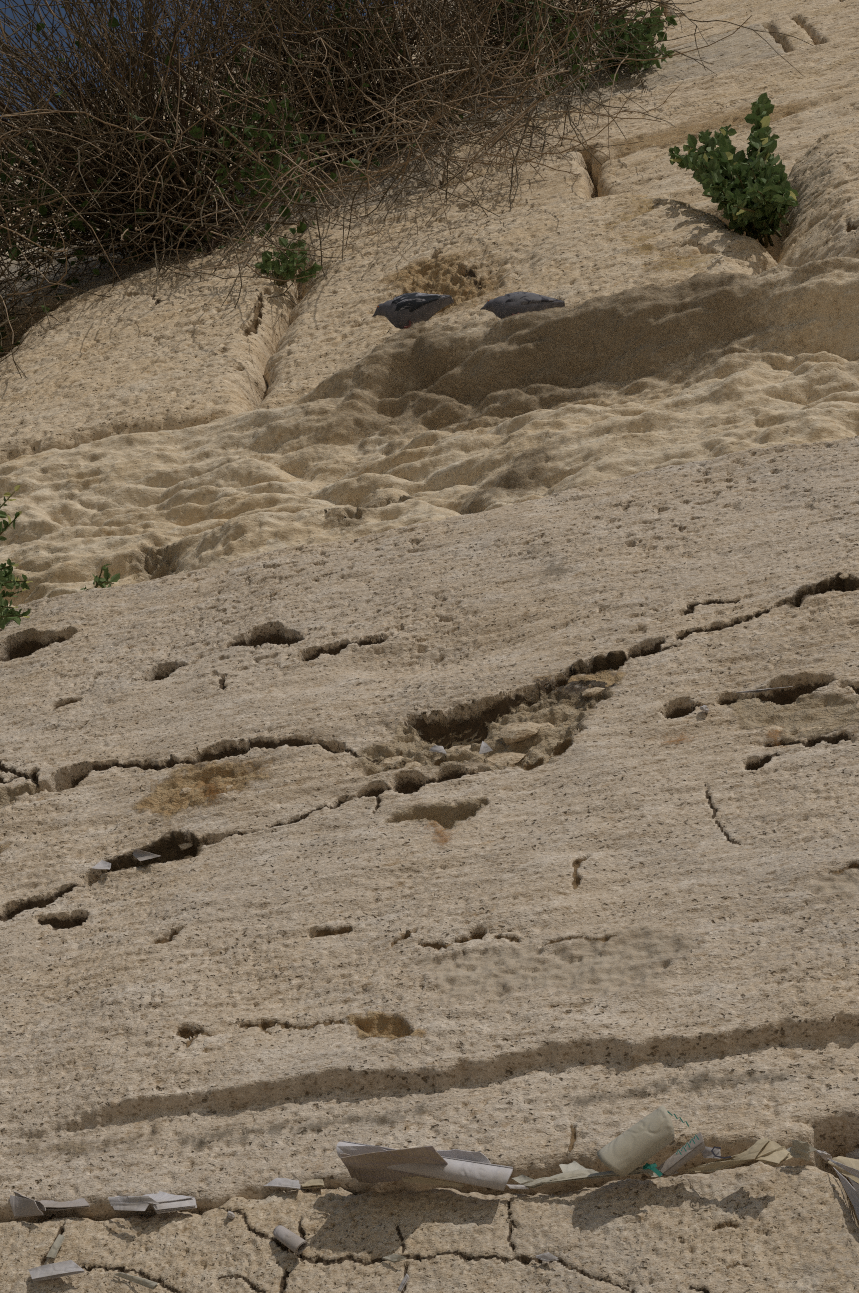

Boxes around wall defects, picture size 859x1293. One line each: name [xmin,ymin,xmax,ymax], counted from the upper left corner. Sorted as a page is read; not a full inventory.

crack [1,637,66,662]
crack [227,631,385,662]
crack [626,600,773,660]
spalling [358,650,628,776]
crack [666,683,859,719]
crack [0,762,39,787]
crack [71,679,573,836]
crack [745,733,851,770]
spalling [97,759,269,877]
spalling [385,796,487,830]
crack [0,885,88,930]
crack [218,1198,643,1293]